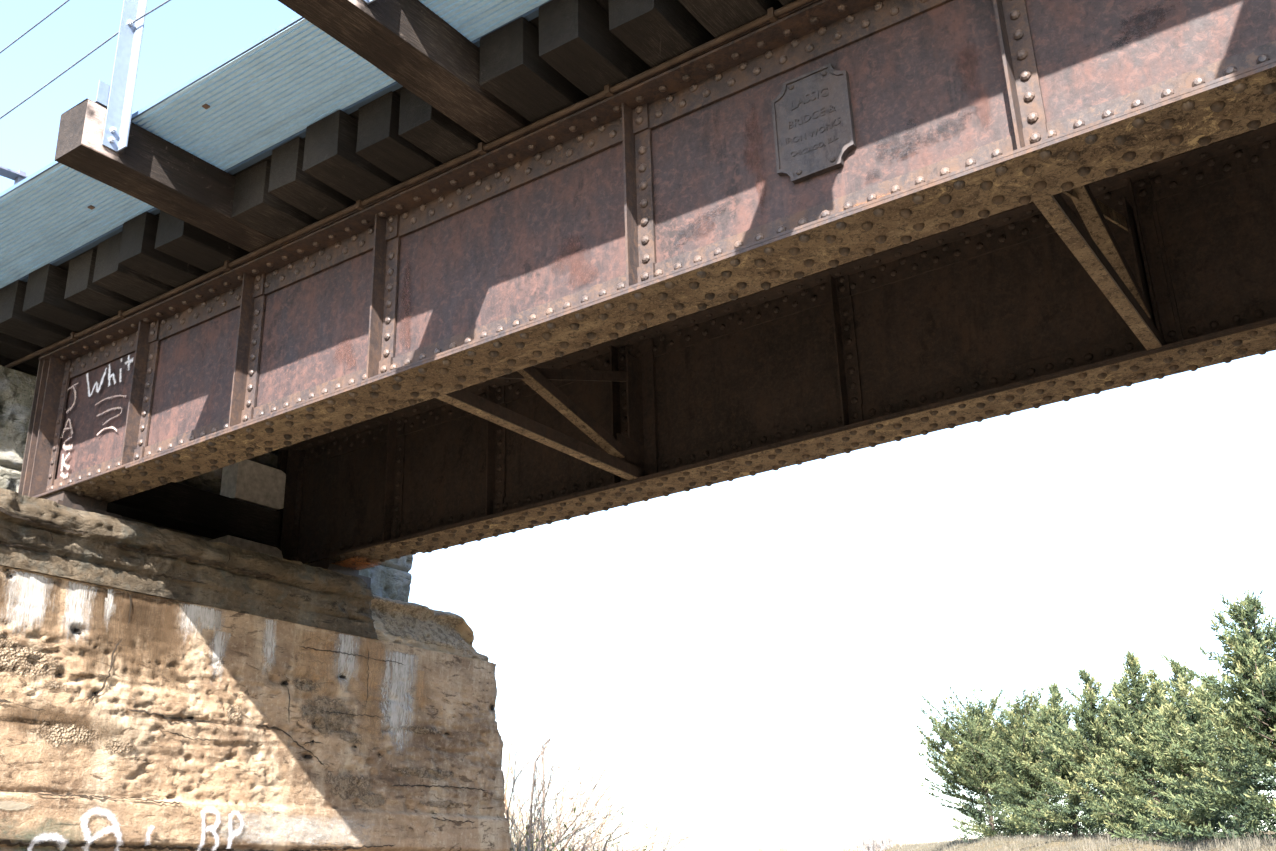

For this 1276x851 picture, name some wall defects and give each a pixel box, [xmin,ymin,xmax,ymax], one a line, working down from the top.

crack [0,507,276,584]
crack [0,699,44,711]
water stain [6,706,120,739]
crack [84,590,132,703]
water stain [0,571,226,683]
crack [128,709,221,741]
water stain [264,620,275,666]
crack [257,689,324,765]
crack [301,646,403,718]